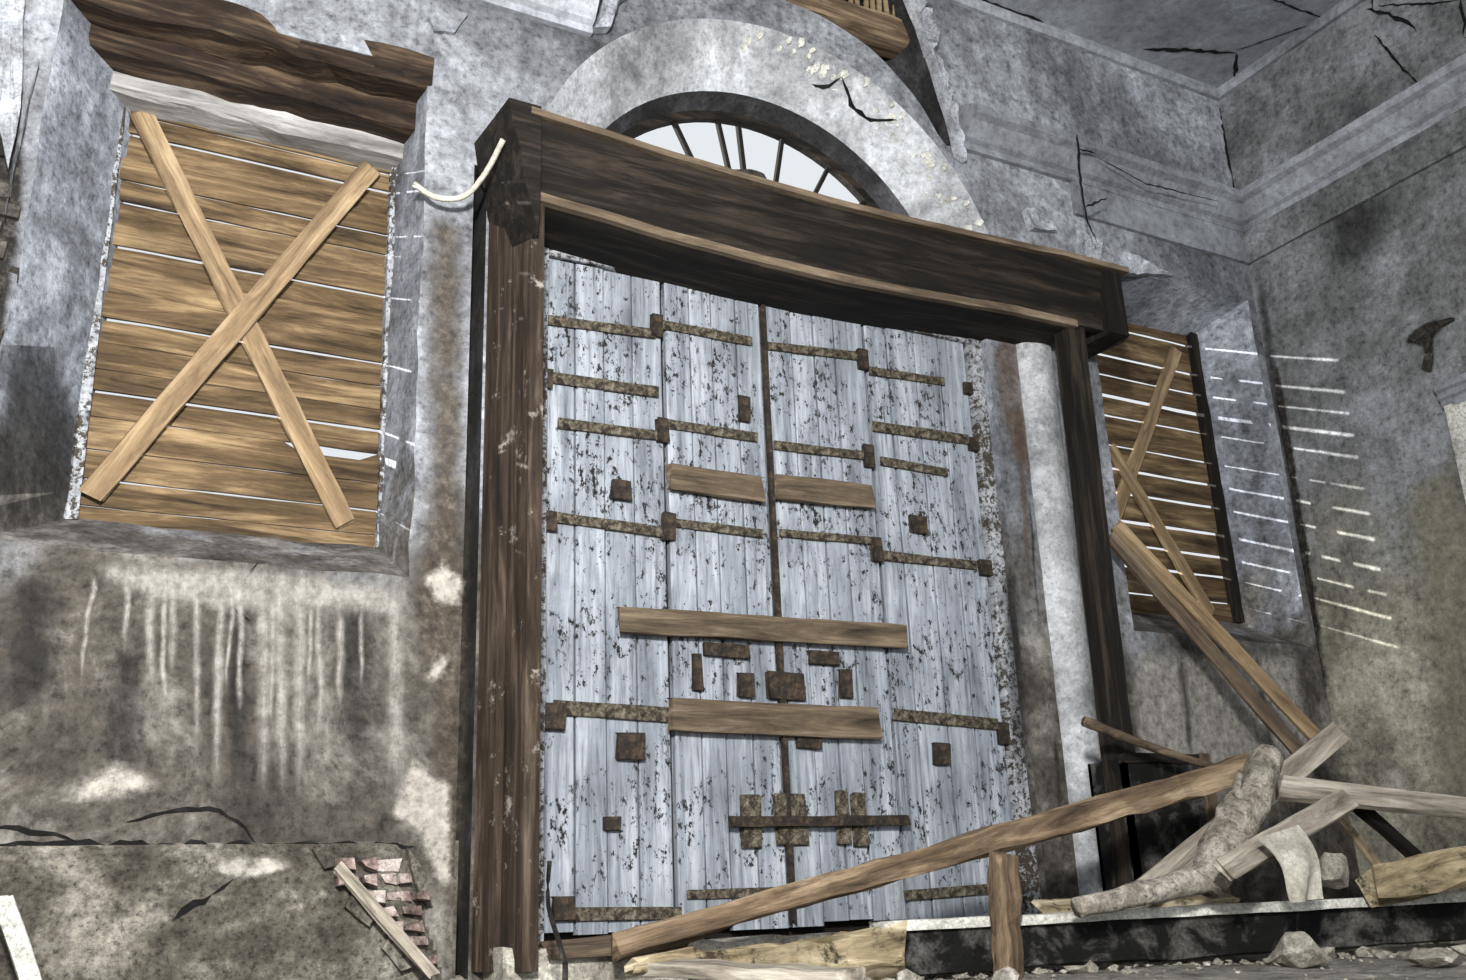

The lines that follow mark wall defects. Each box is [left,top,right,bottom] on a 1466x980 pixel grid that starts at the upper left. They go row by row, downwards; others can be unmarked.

crack [812,77,897,122]
crack [1367,0,1466,83]
peeling [0,0,39,343]
peeling [3,345,70,494]
water stain [77,226,461,884]
crack [0,806,414,849]
crack [173,879,233,920]
spalling [311,845,438,971]